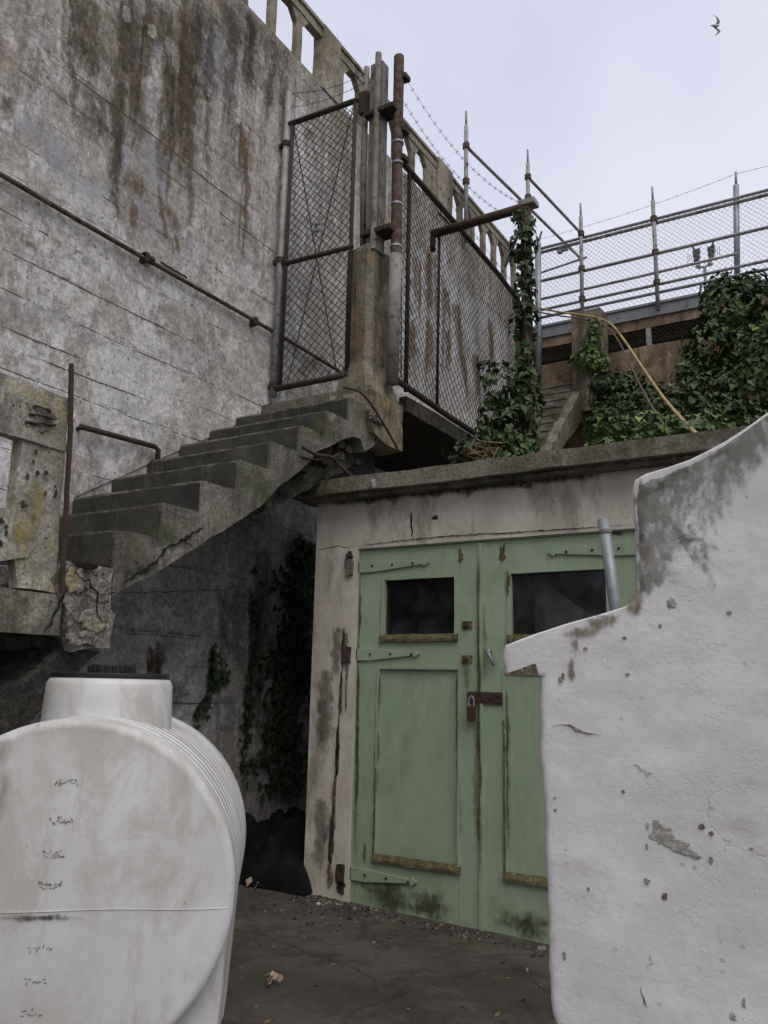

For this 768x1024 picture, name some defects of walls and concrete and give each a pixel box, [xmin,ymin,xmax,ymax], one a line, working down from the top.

rust [237,123,251,254]
rust [409,252,494,404]
spalling [244,439,362,518]
peeling [65,561,110,647]
crack [44,523,224,638]
water stain [317,628,341,747]
peeling [558,615,616,683]
crack [553,724,598,736]
water stain [314,800,330,862]
spalling [646,820,714,865]
water stain [362,883,445,918]
water stain [504,914,546,938]